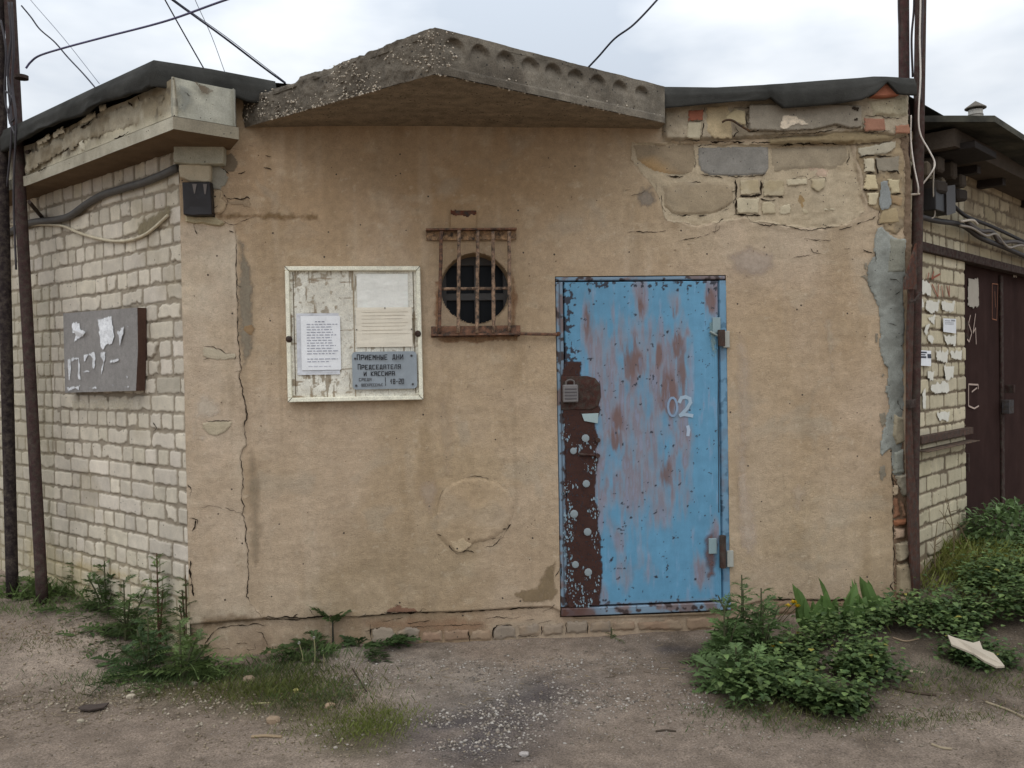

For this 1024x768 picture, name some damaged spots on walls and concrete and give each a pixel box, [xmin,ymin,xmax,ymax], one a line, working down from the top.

peeling [25,95,165,174]
spalling [631,109,910,242]
crack [188,145,554,650]
rust [561,361,582,376]
rust [562,405,603,608]
rust [706,535,715,576]